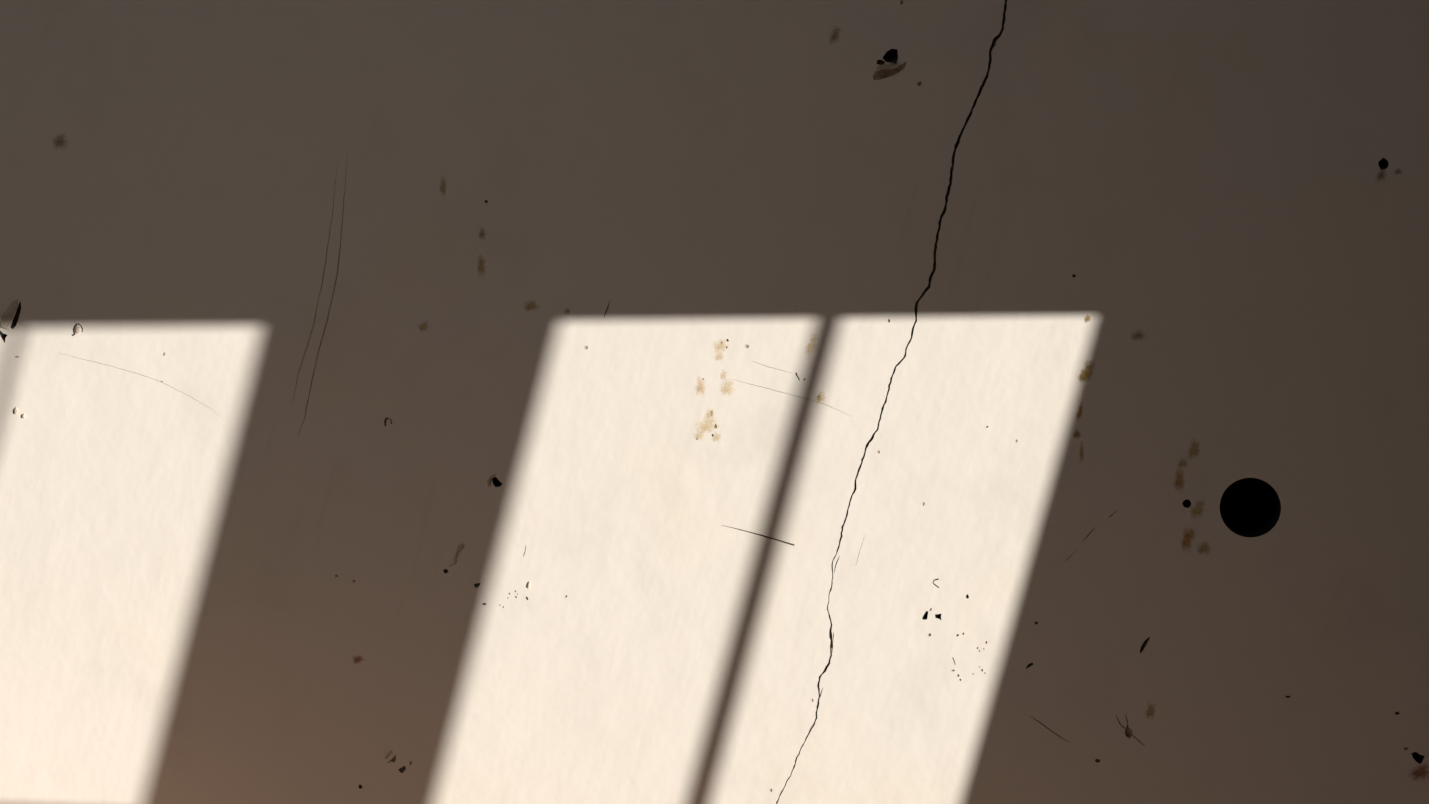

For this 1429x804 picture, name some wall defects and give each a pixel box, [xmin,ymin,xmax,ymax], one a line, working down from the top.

crack [776,0,1007,804]